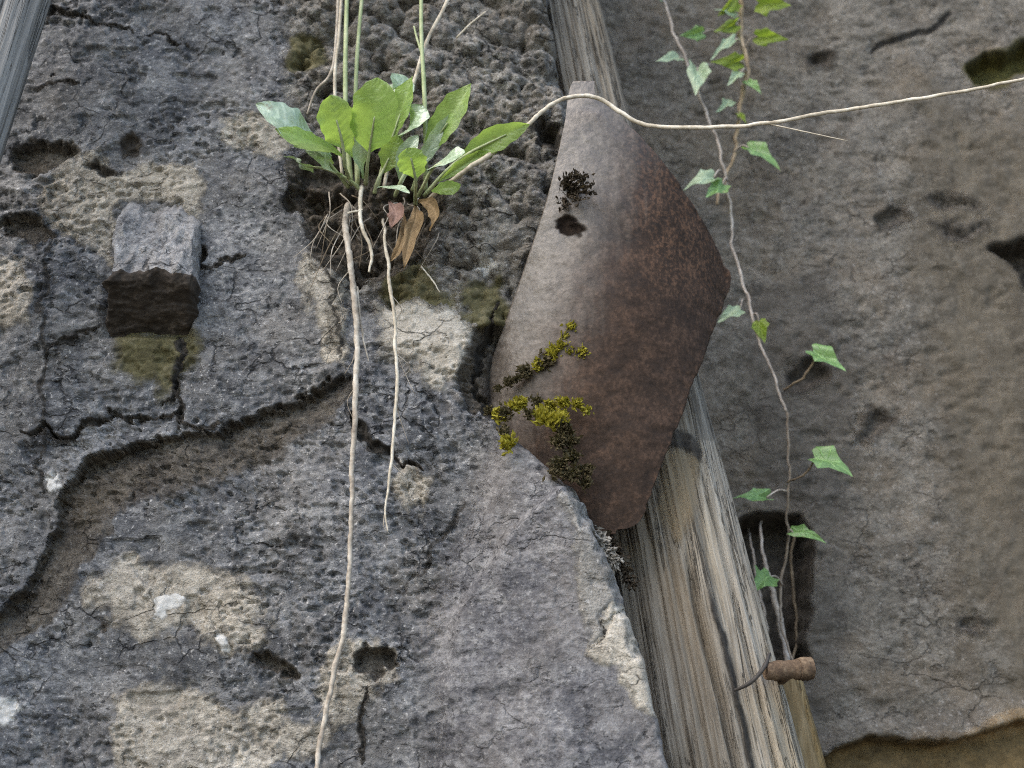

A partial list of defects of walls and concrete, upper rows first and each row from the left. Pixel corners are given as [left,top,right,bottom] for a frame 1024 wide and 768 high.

leakage [114,330,200,393]
spalling [0,253,353,680]
spalling [739,512,815,661]